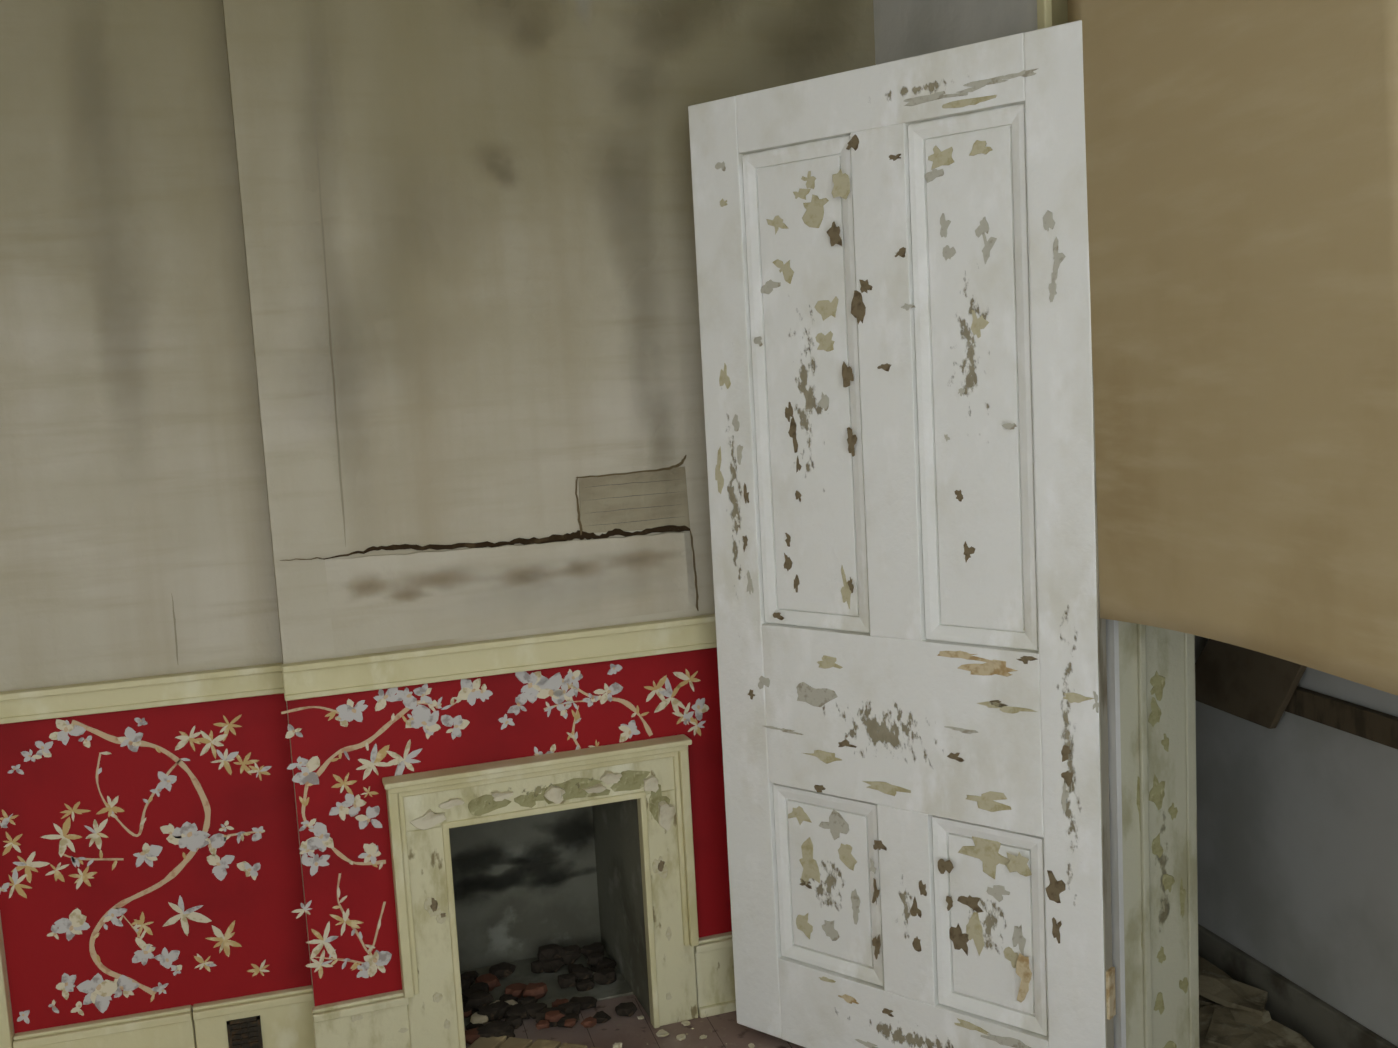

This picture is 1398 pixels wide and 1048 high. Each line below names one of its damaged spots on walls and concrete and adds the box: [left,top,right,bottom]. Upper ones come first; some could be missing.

peeling [766,169,850,246]
crack [280,25,699,611]
peeling [785,279,872,473]
peeling [953,289,989,396]
peeling [715,414,754,594]
peeling [937,651,1037,677]
peeling [409,770,675,831]
peeling [803,702,979,764]
peeling [1057,636,1099,838]
peeling [788,806,887,941]
peeling [899,880,927,952]
peeling [938,836,1070,1002]